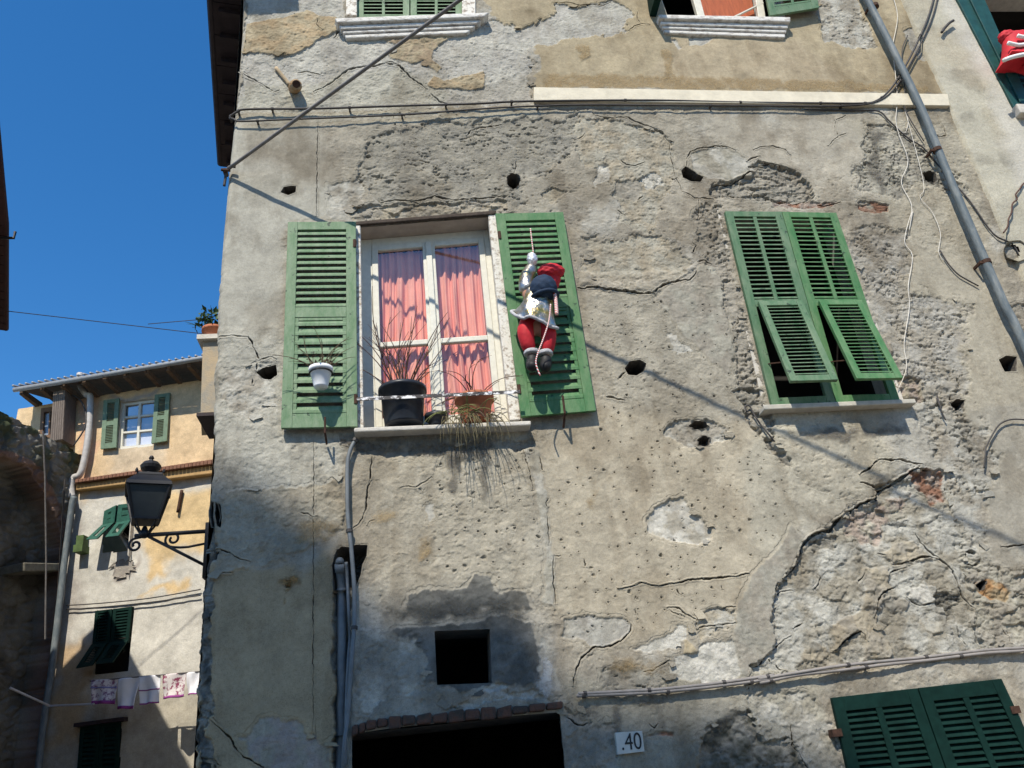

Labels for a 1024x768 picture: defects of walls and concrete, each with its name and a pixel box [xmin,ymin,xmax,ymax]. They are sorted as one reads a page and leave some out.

crack [573,114,841,297]
spalling [234,0,838,768]
crack [351,455,375,530]
crack [400,476,432,490]
crack [772,457,930,603]
spalling [695,121,1024,768]
water stain [401,600,520,624]
efflorescence [537,659,552,696]
crack [571,571,750,686]
crack [744,622,804,691]
crack [831,533,1024,654]